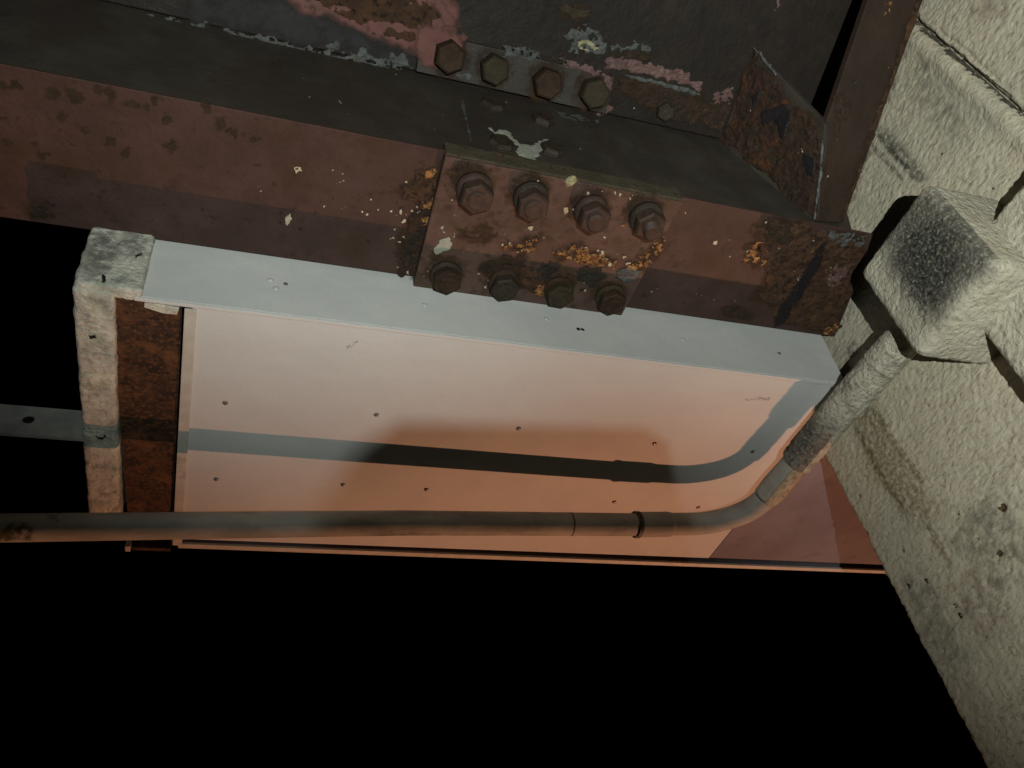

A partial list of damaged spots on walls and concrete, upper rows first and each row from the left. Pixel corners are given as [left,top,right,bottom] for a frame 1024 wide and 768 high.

peeling [223,0,466,75]
peeling [503,24,703,92]
peeling [710,87,734,108]
peeling [488,127,548,160]
rust [362,165,439,278]
rust [459,224,548,297]
rust [551,236,666,271]
rust [722,218,867,335]
water stain [902,228,959,309]